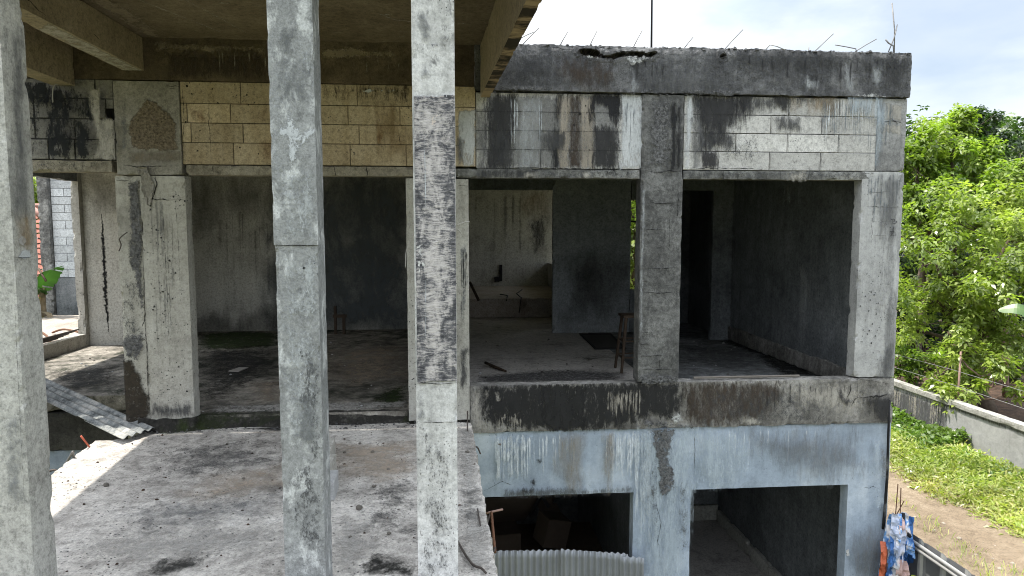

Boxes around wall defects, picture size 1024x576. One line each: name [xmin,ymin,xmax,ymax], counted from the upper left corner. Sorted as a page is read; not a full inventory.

spalling [587,3,909,65]
leakage [15,44,106,208]
spalling [129,100,178,151]
leakage [482,56,643,178]
leakage [630,61,893,180]
spalling [643,414,693,495]
leakage [332,339,1024,575]